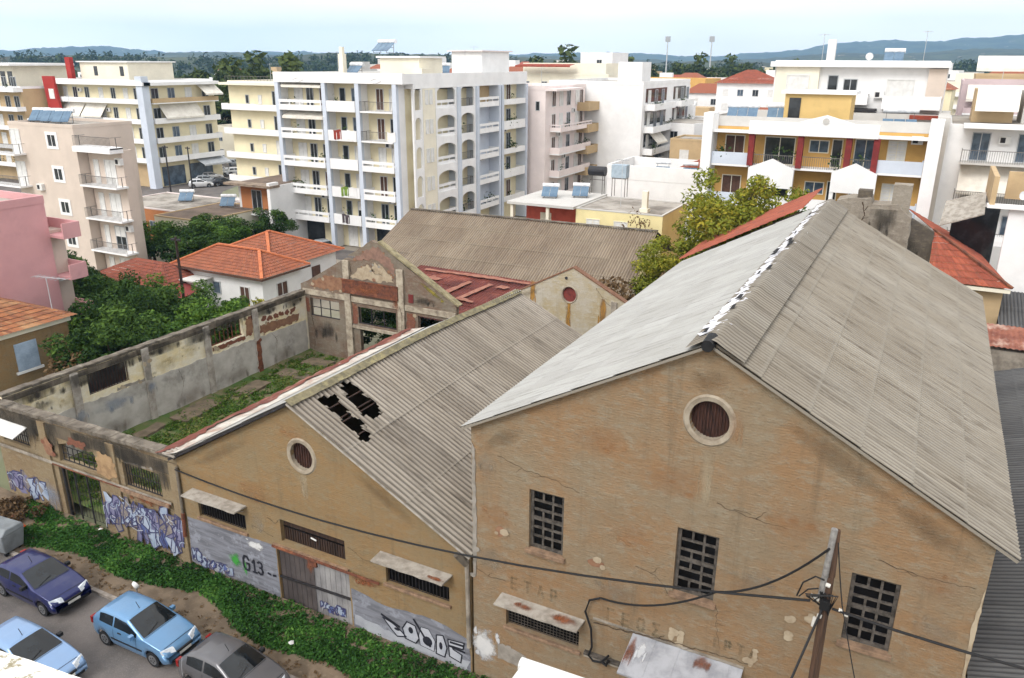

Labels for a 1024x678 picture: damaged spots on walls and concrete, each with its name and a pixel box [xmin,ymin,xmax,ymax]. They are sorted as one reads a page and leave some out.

peeling [213,247,396,351]
crack [880,560,975,589]
spalling [784,613,815,641]
peeling [473,626,526,660]
rust [622,640,646,662]
rust [694,658,710,670]